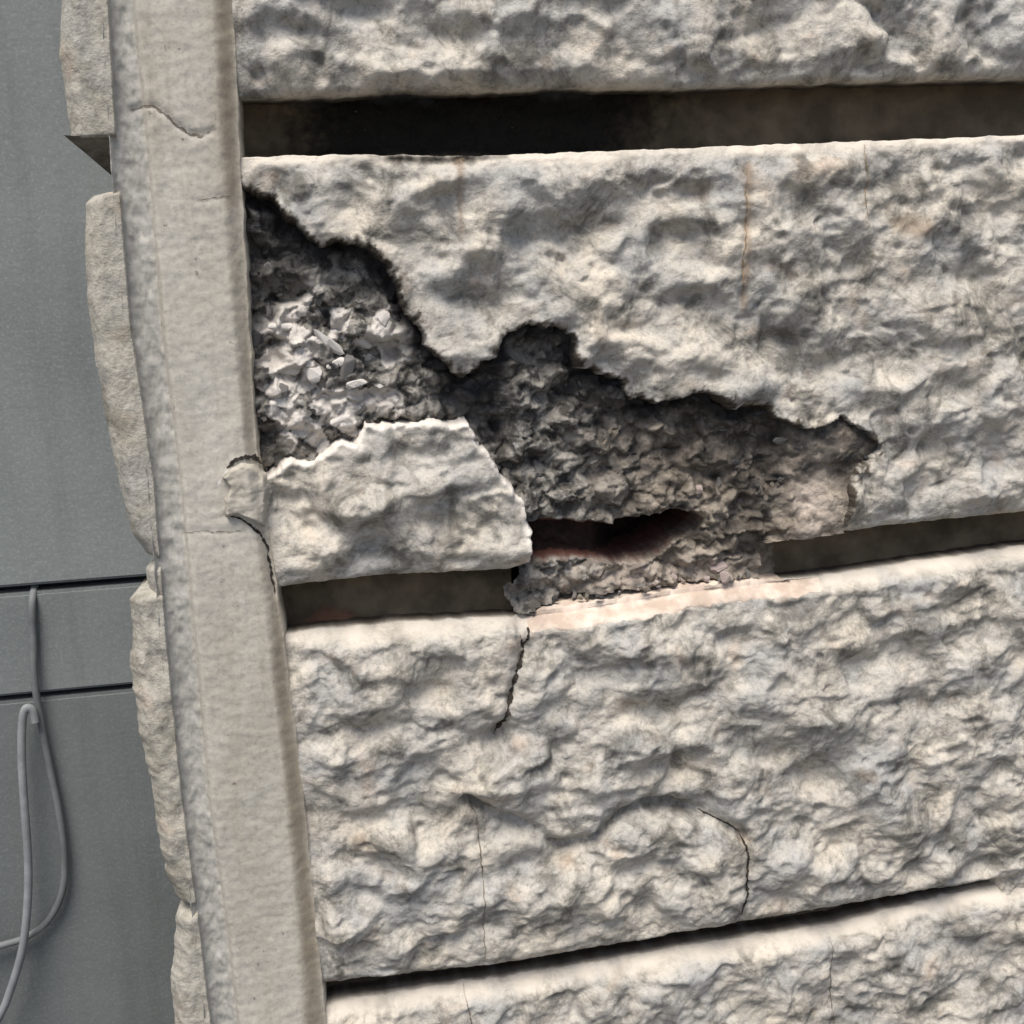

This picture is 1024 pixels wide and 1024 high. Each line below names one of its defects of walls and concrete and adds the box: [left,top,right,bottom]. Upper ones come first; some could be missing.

crack [130,105,210,137]
spalling [217,192,877,633]
crack [185,515,275,592]
crack [494,627,530,735]
crack [698,808,750,914]